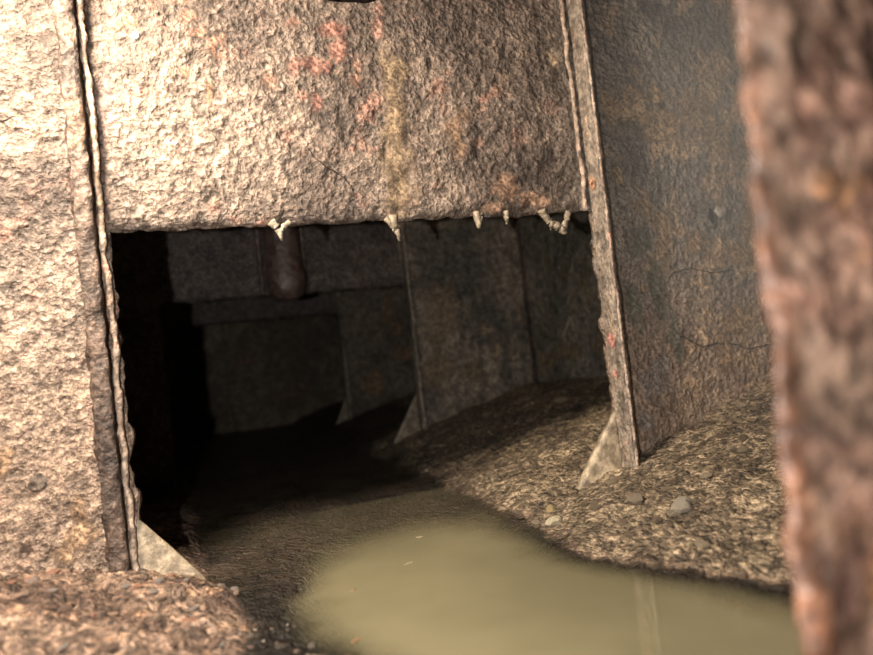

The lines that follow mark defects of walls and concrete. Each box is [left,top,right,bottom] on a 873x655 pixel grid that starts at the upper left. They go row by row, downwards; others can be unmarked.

rust [289,22,346,74]
rust [350,58,360,86]